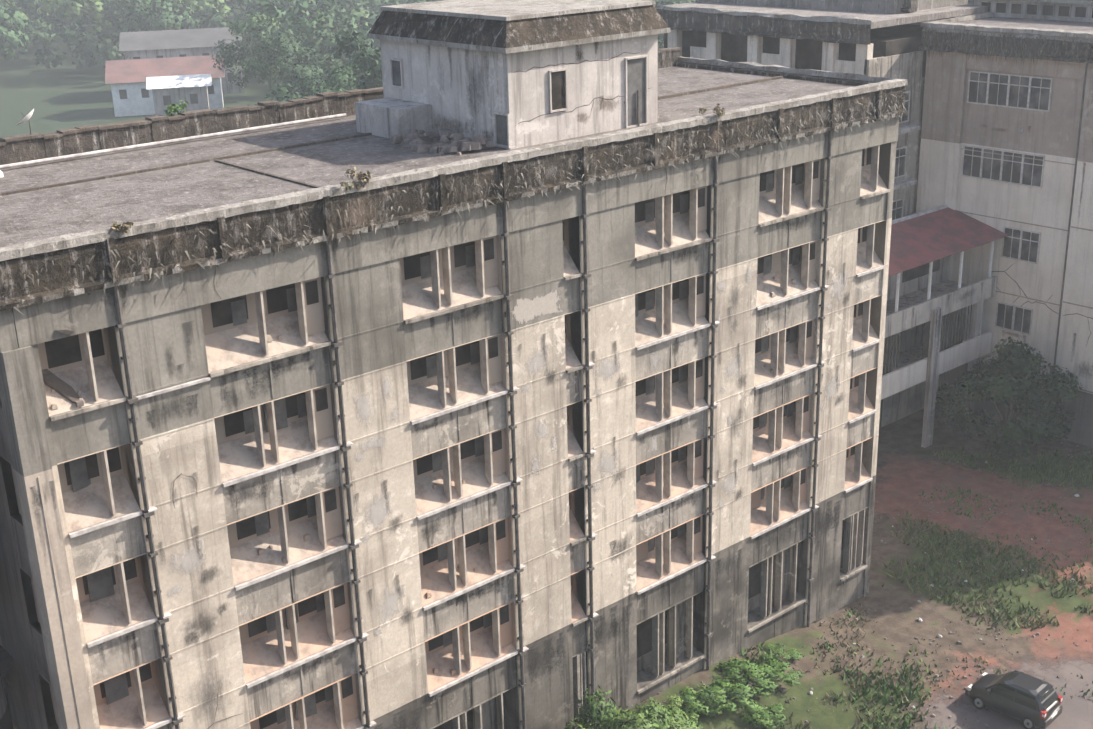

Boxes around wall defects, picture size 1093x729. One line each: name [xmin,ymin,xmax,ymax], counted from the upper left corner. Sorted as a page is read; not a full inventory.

water stain [595,603,631,640]